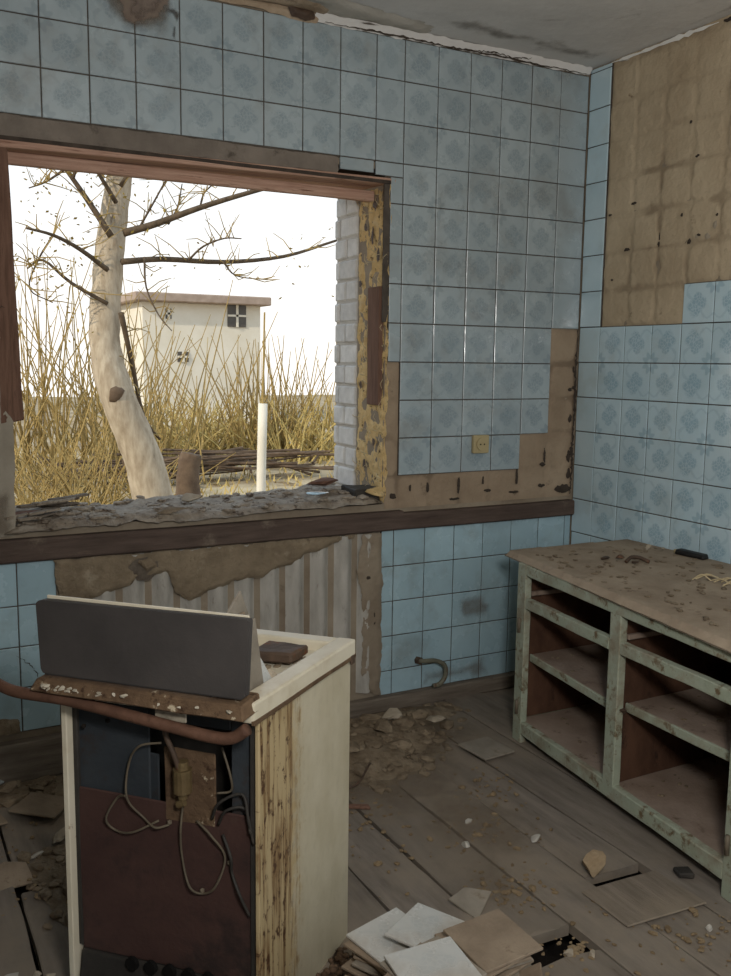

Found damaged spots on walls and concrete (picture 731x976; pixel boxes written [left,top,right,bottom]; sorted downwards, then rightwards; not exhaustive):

peeling [602,14,731,326]
flaking render [0,408,16,537]
peeling [53,533,384,695]
peeling [352,184,577,509]